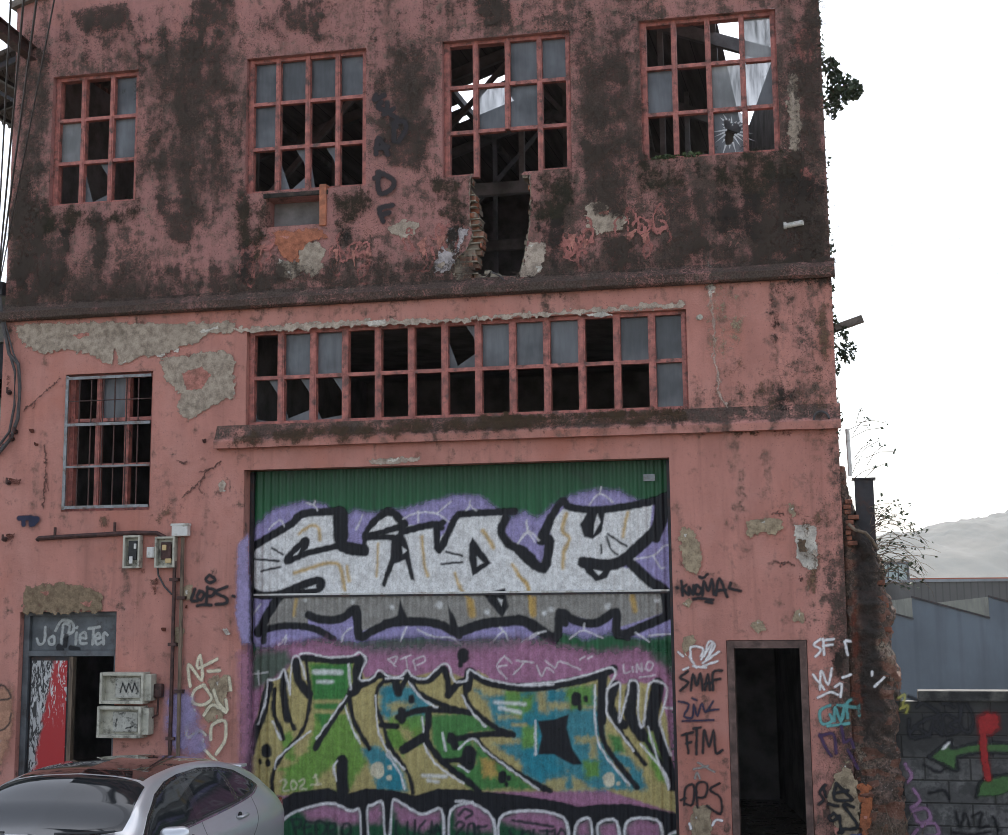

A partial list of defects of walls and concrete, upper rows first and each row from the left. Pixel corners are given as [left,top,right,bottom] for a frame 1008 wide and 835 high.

damp [421,0,511,28]
damp [6,0,488,307]
damp [537,0,836,276]
peeling [272,227,328,280]
flaking render [434,173,487,280]
spalling [517,174,546,277]
peeling [560,202,673,268]
damp [789,277,832,287]
peeling [14,300,686,420]
spalling [746,503,818,570]
peeling [21,582,103,615]
peeling [827,766,873,835]